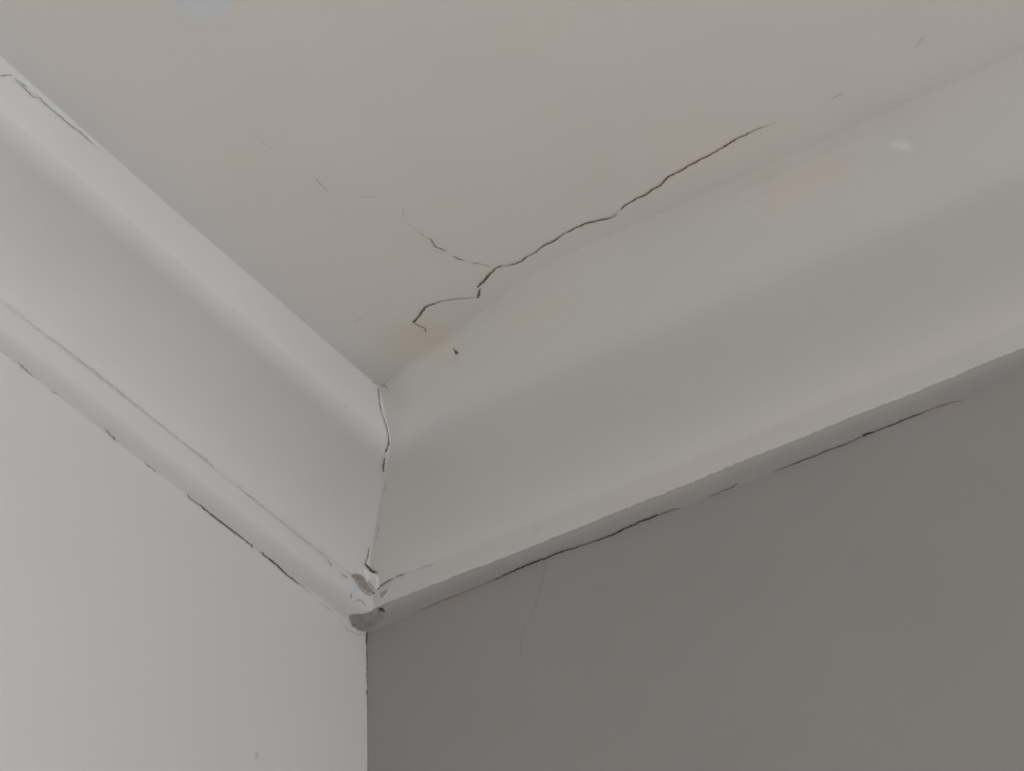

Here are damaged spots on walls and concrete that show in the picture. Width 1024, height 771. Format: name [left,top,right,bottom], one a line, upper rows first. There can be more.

crack [413,128,760,332]
crack [378,388,390,471]
crack [793,404,945,465]
crack [187,495,298,583]
spalling [349,568,390,632]
crack [365,549,403,590]
crack [494,509,677,580]